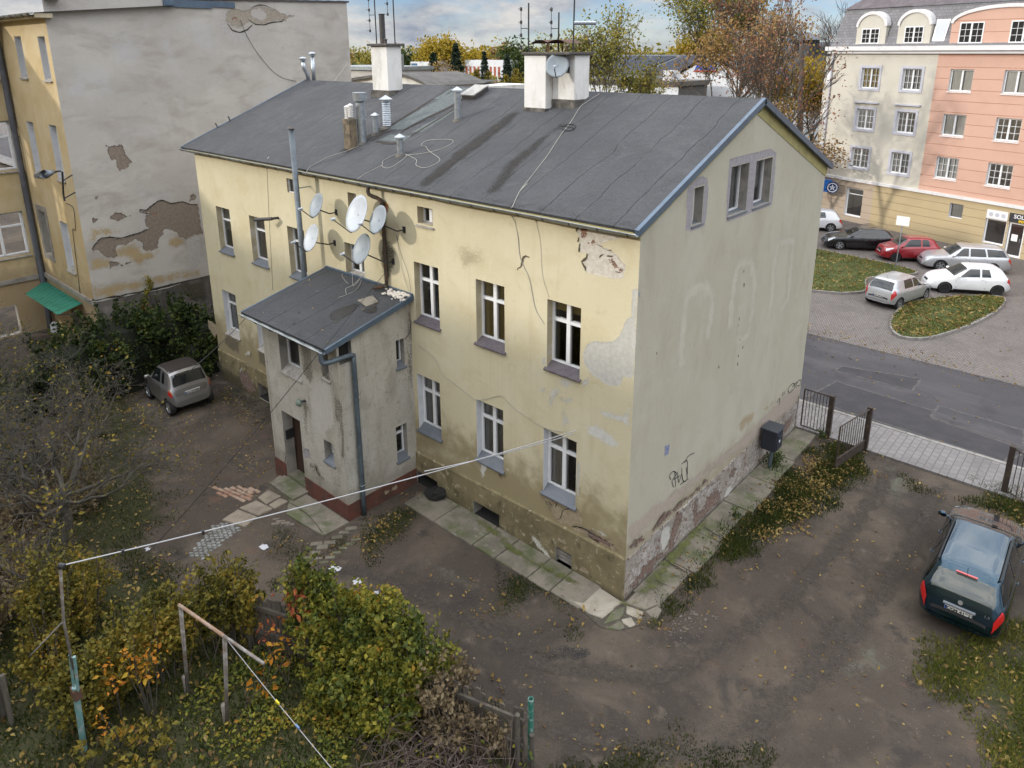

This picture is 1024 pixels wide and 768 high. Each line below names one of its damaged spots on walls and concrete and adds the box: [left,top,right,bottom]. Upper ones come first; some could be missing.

spalling [106,144,132,171]
water stain [377,110,521,192]
water stain [478,114,600,223]
spalling [85,194,203,302]
peeling [575,227,626,280]
spalling [543,479,722,592]